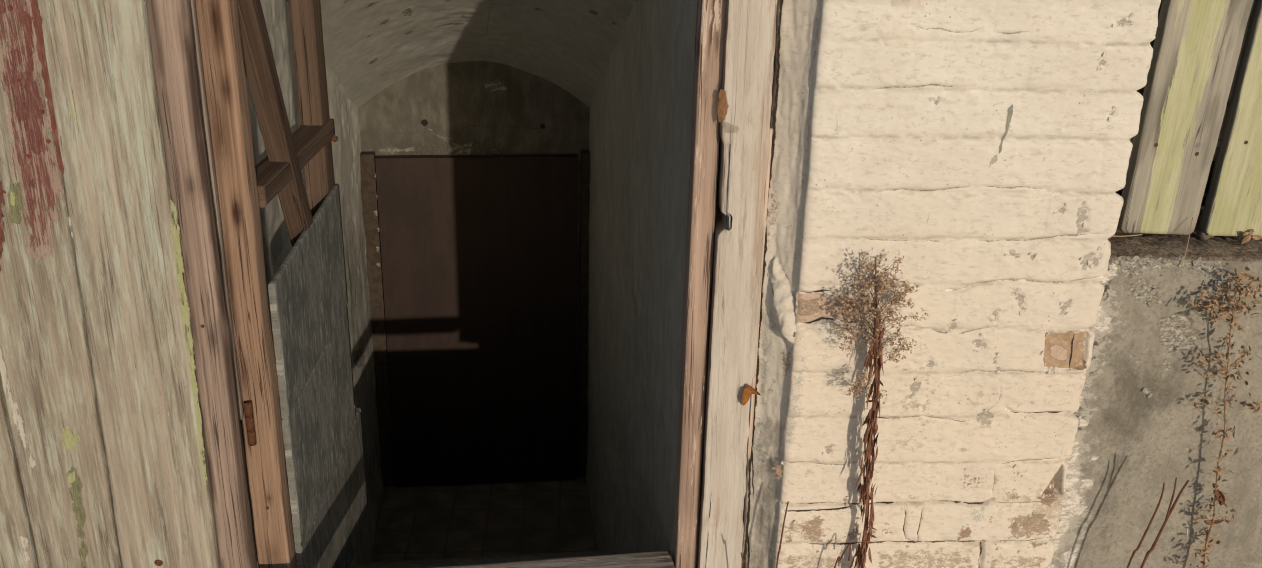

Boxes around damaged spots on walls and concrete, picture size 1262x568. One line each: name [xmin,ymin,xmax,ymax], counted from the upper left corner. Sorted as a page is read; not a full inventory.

peeling [0,0,76,270]
peeling [0,348,36,468]
spalling [795,293,863,322]
spalling [1041,331,1087,374]